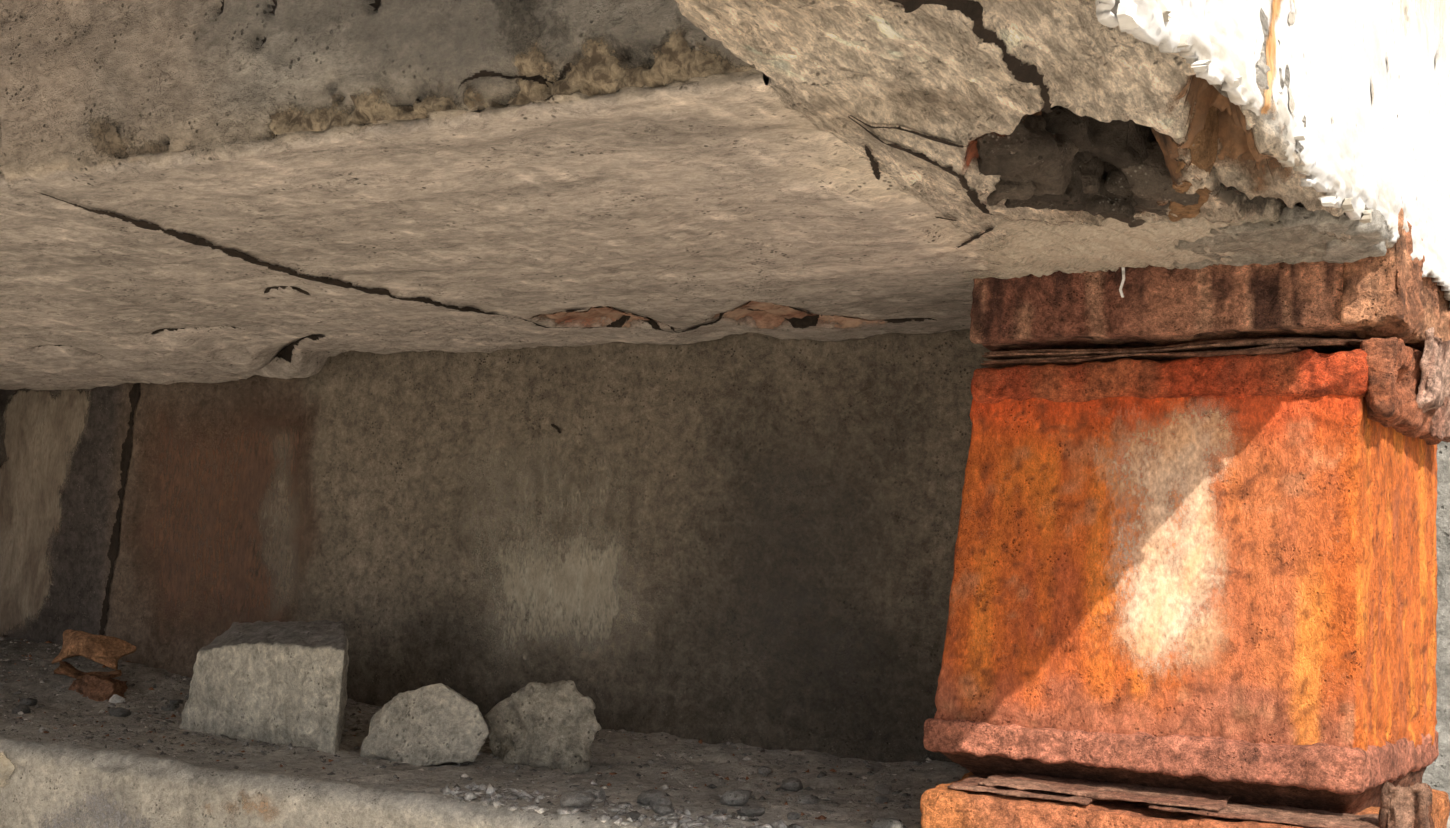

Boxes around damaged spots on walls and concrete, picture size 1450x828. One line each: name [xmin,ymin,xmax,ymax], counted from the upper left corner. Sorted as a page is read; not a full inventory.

leakage [610,33,669,87]
crack [888,0,1060,113]
peeling [1117,0,1139,30]
corrosion [1261,0,1295,115]
crack [848,115,994,249]
spalling [964,60,1387,279]
crack [35,191,834,333]
crack [151,326,245,335]
crack [273,335,325,363]
crack [884,316,939,324]
corrosion [981,327,1450,445]
corrosion [947,773,1379,828]